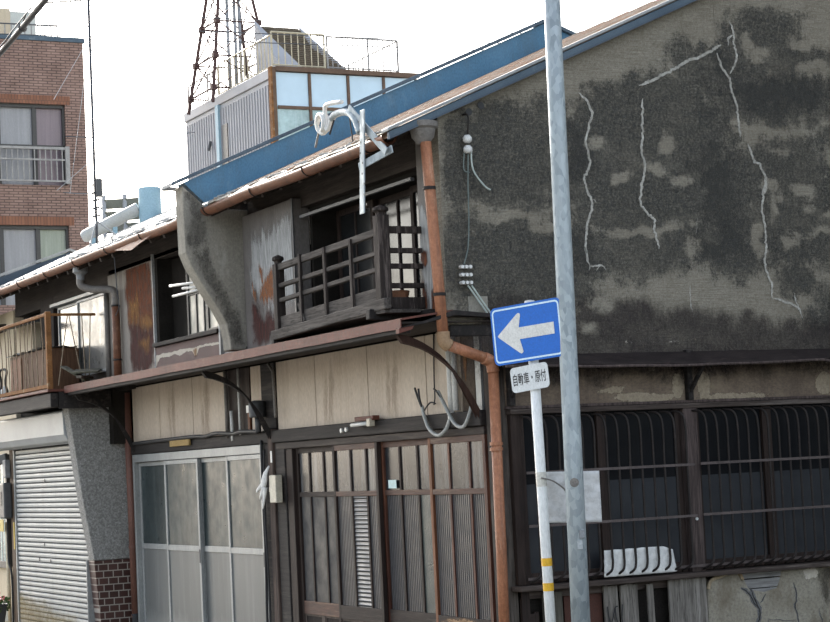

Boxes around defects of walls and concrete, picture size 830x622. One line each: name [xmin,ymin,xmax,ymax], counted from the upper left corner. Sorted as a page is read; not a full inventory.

water stain [440,92,557,325]
crack [579,93,606,271]
water stain [565,5,830,354]
crack [639,3,803,318]
corrosion [125,262,155,372]
peeling [156,342,219,367]
corrosion [252,266,275,347]
peeling [250,216,294,320]
water stain [451,335,494,355]
water stain [548,367,560,384]
water stain [578,364,772,385]
crack [741,583,799,622]